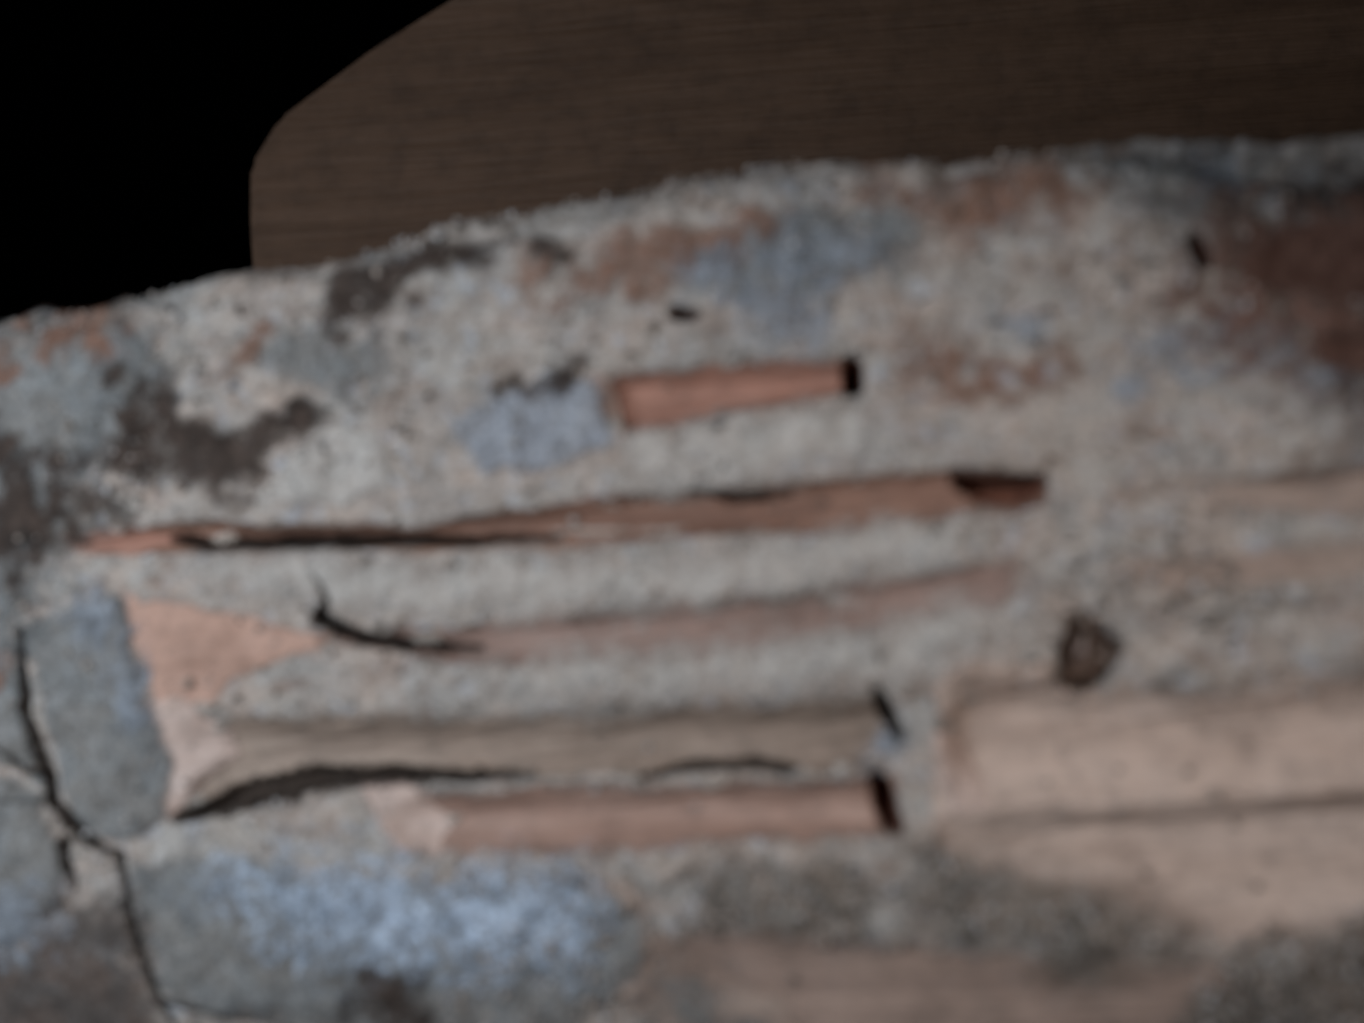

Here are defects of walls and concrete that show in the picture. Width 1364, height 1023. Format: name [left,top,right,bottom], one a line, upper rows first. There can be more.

spalling [61,458,1048,570]
spalling [574,358,863,444]
crack [0,624,272,1023]
crack [168,761,539,825]
spalling [124,557,1022,869]
spalling [931,653,1364,947]